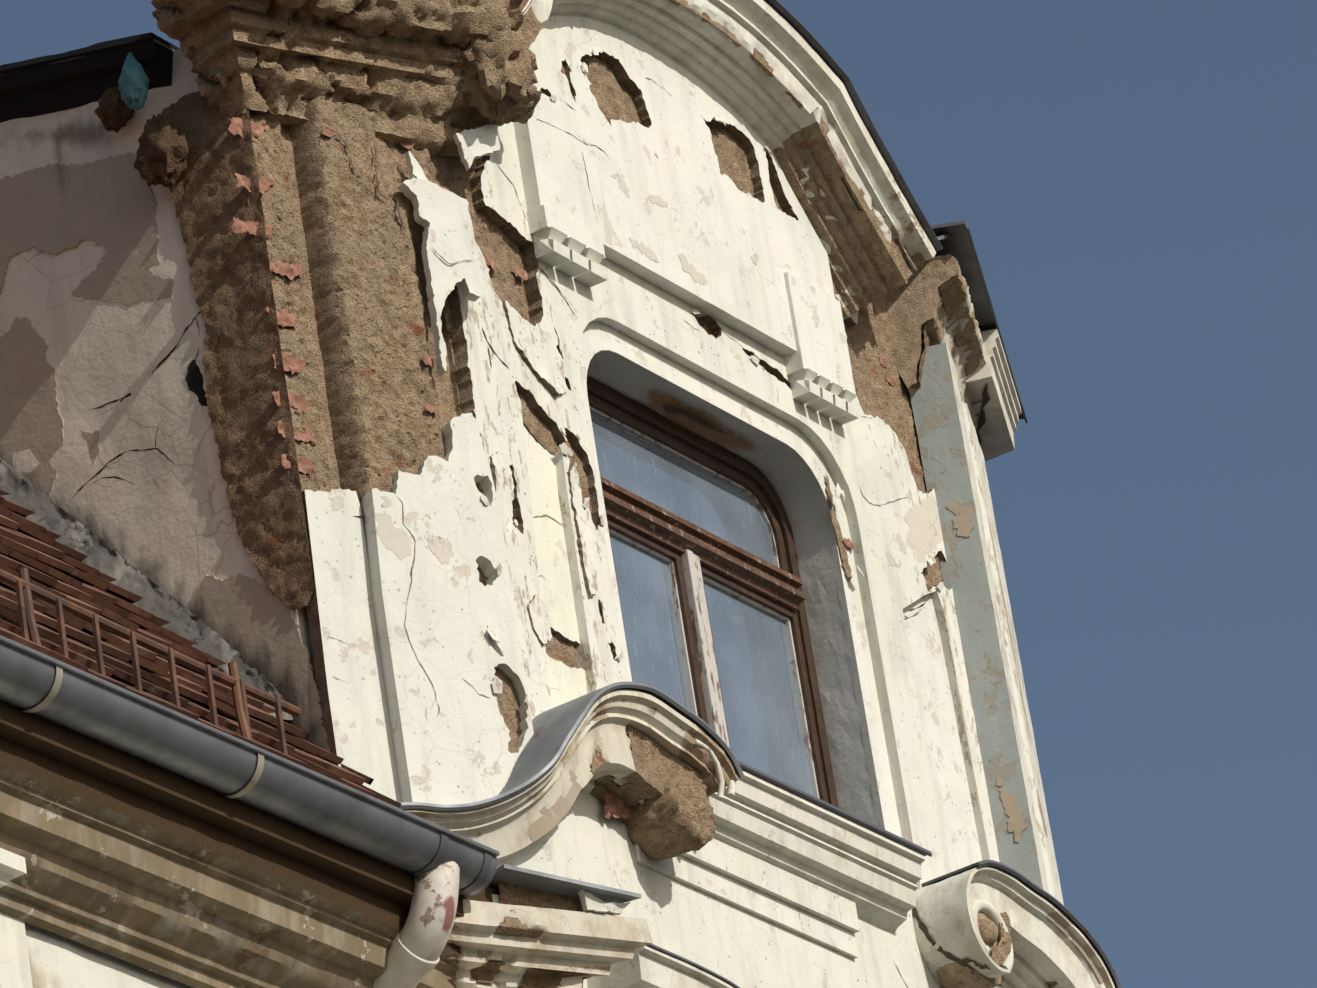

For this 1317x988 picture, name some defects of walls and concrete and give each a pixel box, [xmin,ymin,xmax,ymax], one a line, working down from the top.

flaking render [561,48,643,125]
flaking render [706,115,755,198]
peeling [0,152,174,306]
peeling [0,317,64,498]
crack [75,425,175,494]
crack [93,311,201,409]
flaking render [161,91,567,762]
spalling [939,278,984,376]
flaking render [844,296,1031,743]
crack [402,502,489,720]
flaking render [527,595,579,669]
flaking render [603,778,716,859]